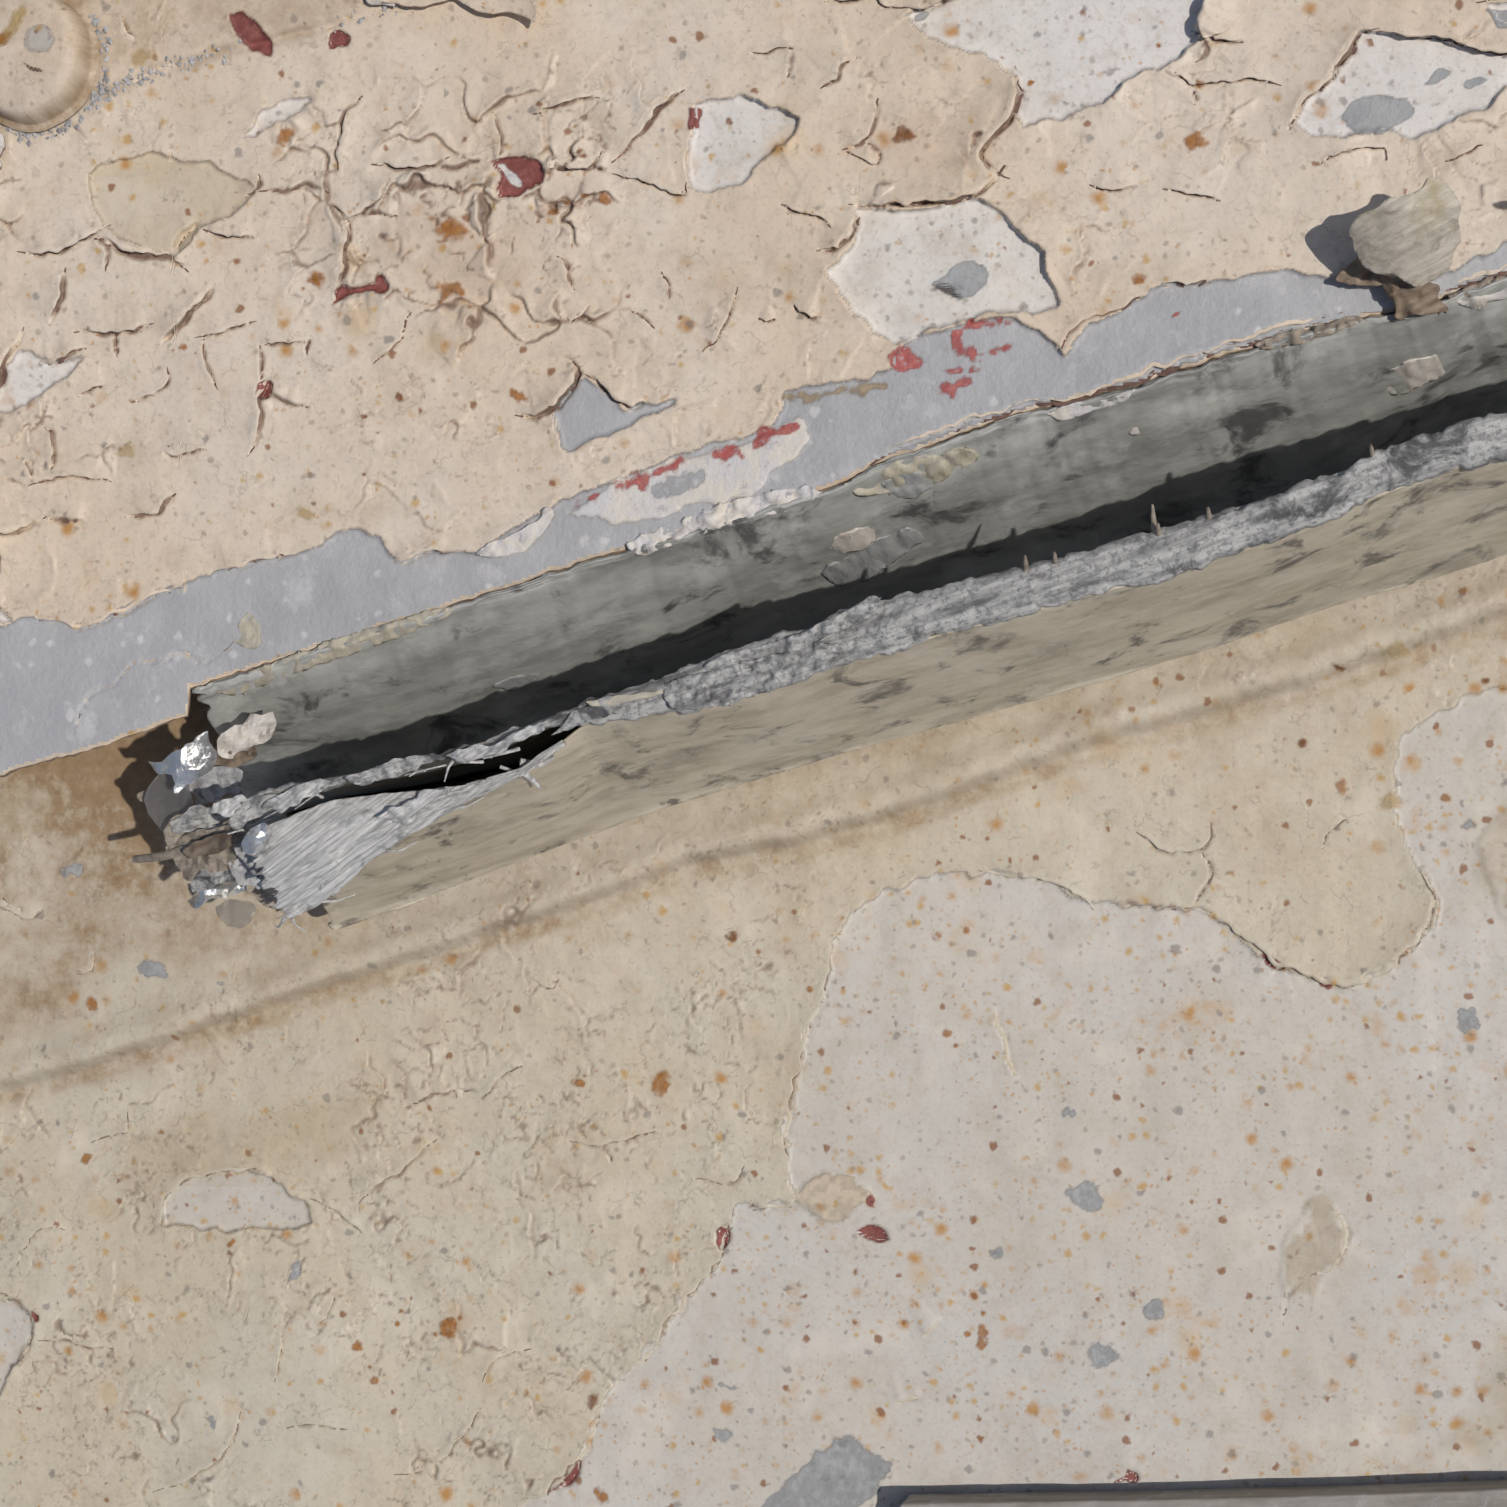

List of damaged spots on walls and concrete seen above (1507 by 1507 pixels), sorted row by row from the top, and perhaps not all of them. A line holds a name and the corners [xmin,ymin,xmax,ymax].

peeling [366,0,537,23]
crack [547,81,687,196]
peeling [687,94,799,193]
crack [781,66,1024,252]
peeling [904,0,1251,127]
peeling [1296,30,1507,139]
crack [0,96,502,534]
crack [515,256,650,419]
crack [698,286,821,352]
peeling [0,198,1394,773]
crack [310,1061,523,1233]
peeling [521,687,1507,1507]